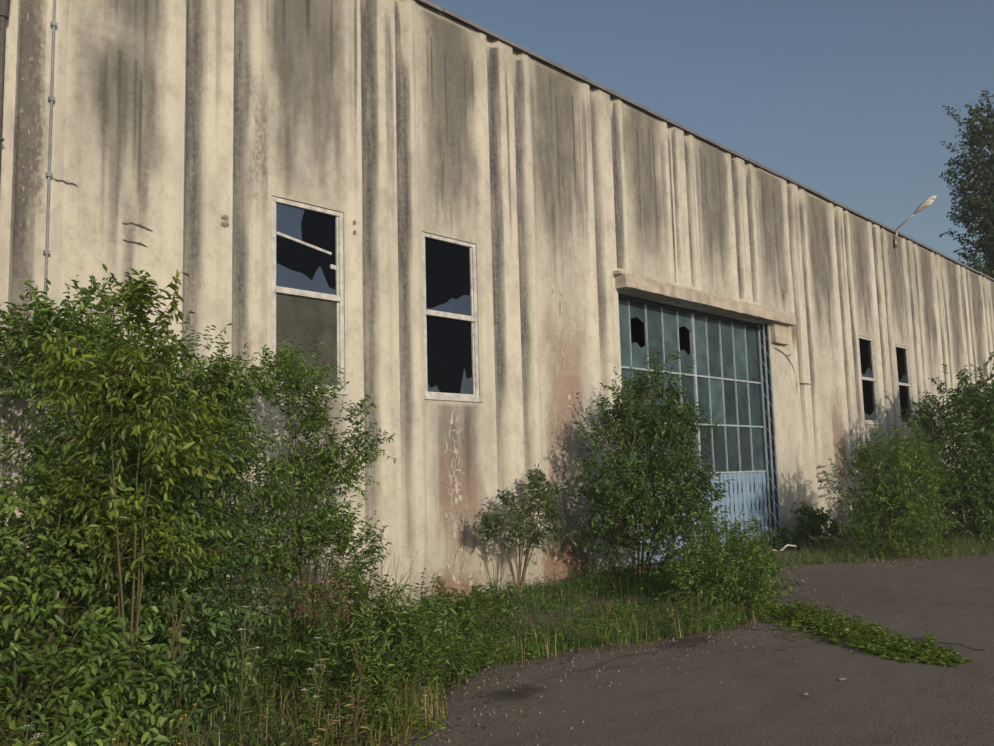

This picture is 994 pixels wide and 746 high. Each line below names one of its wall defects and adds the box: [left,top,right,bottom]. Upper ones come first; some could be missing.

water stain [96,56,136,123]
crack [122,222,153,247]
water stain [487,48,504,417]
water stain [514,60,529,408]
water stain [611,105,622,269]
water stain [668,137,692,265]
water stain [701,149,753,291]
water stain [760,171,858,396]
water stain [864,229,990,400]